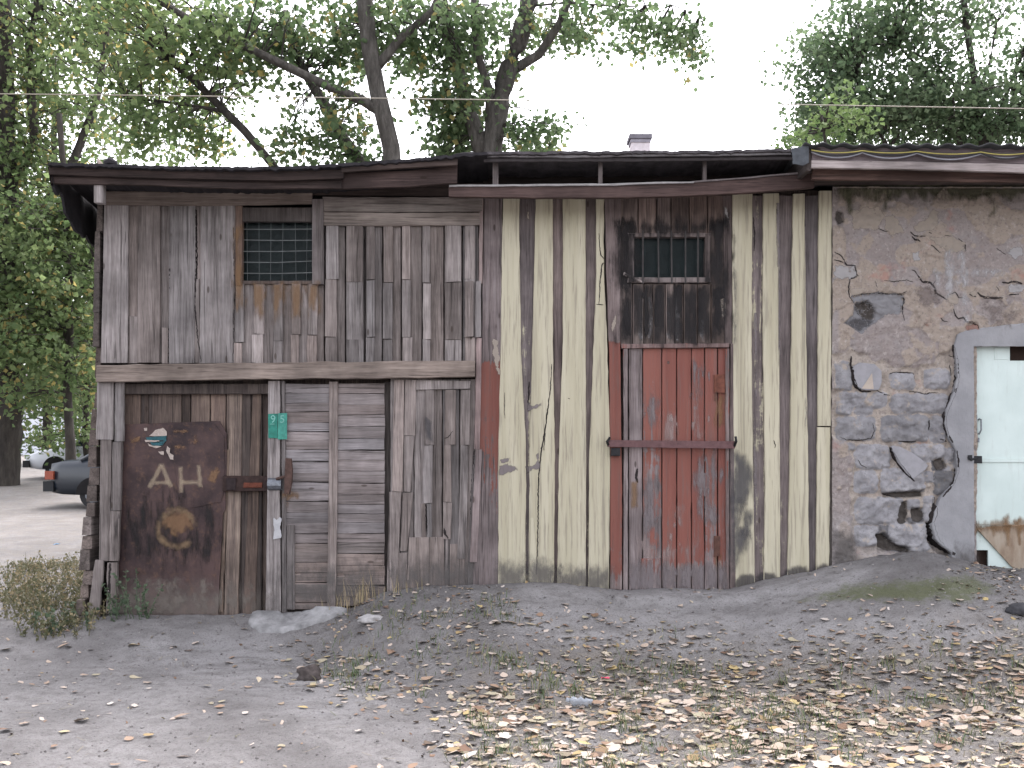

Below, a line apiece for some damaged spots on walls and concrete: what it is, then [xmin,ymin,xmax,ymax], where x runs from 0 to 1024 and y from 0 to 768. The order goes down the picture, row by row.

crack [169,209,202,361]
crack [596,235,604,305]
spalling [844,288,904,334]
crack [880,229,966,253]
flaking render [850,356,882,392]
crack [835,252,1023,556]
crack [504,364,570,565]
flaking render [883,445,946,524]
corrosion [160,509,193,548]
peeling [628,476,727,589]
spalling [875,534,908,552]
corrosion [975,516,1024,544]